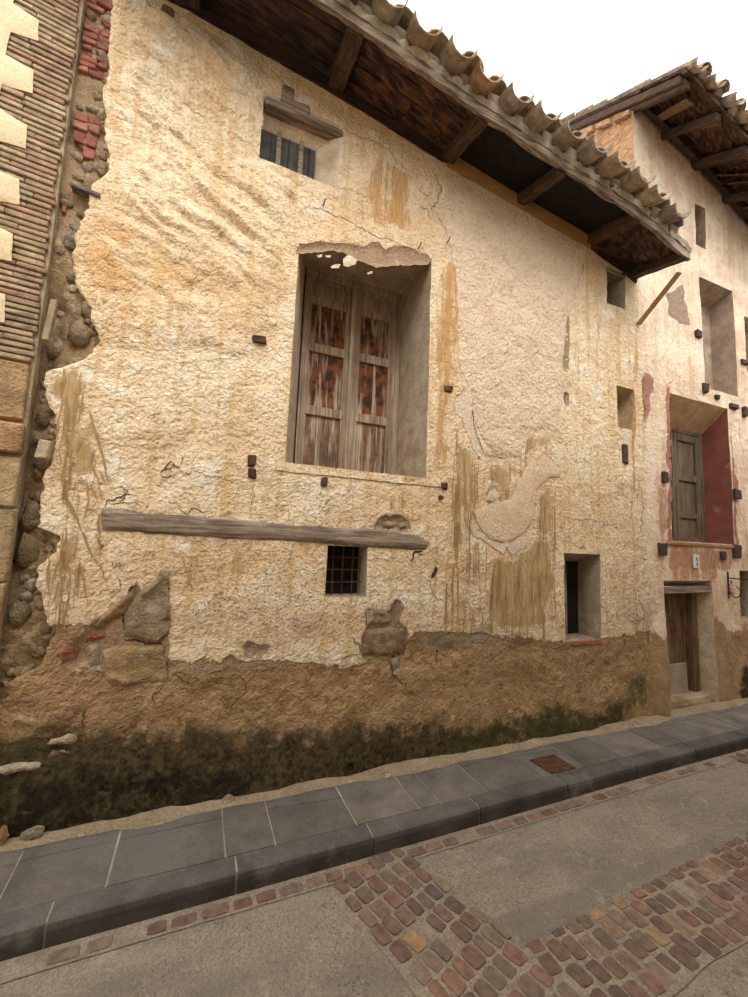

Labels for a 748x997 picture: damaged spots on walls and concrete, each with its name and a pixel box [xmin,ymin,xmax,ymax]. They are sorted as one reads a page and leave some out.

spalling [296,241,432,274]
spalling [0,0,113,699]
leakage [46,369,109,645]
crack [100,412,255,511]
leakage [418,263,557,684]
spalling [59,569,171,687]
spalling [221,640,277,670]
spalling [361,599,409,675]
leakage [0,676,647,839]